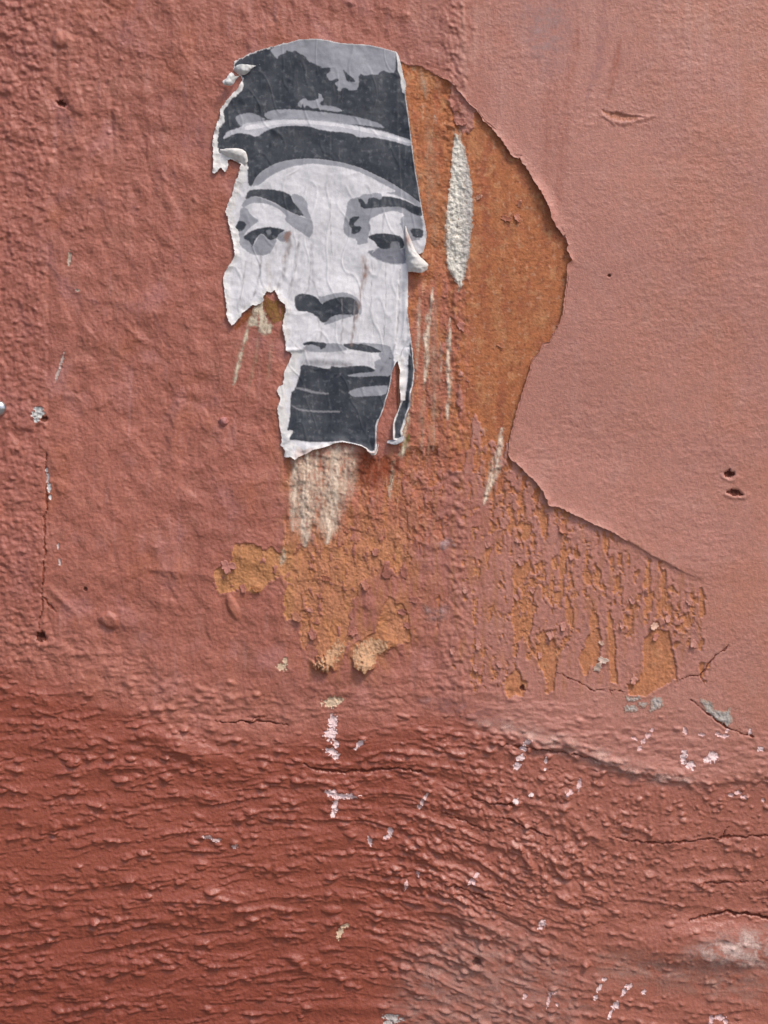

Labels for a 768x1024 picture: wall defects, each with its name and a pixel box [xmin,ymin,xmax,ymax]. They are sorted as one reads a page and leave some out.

peeling [213,63,710,713]
crack [39,453,54,629]
crack [215,716,290,726]
peeling [320,696,344,760]
crack [304,763,422,774]
peeling [324,789,362,818]
crack [617,826,768,844]